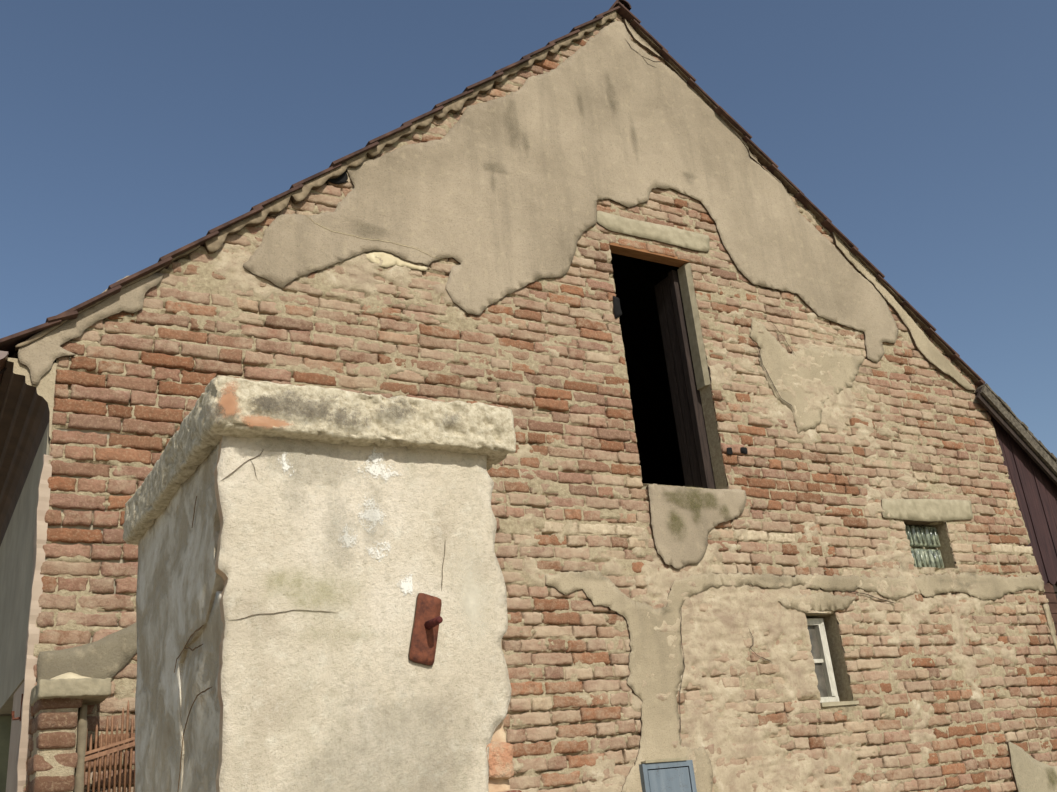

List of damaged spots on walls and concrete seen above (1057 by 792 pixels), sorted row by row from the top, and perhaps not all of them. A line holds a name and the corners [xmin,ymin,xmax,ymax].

peeling [243,18,976,433]
peeling [18,274,163,385]
spalling [218,383,289,427]
crack [222,449,264,480]
peeling [37,623,137,684]
crack [174,625,204,673]
crack [236,610,336,620]
peeling [545,484,1057,792]
crack [177,687,212,792]
spalling [486,741,521,792]